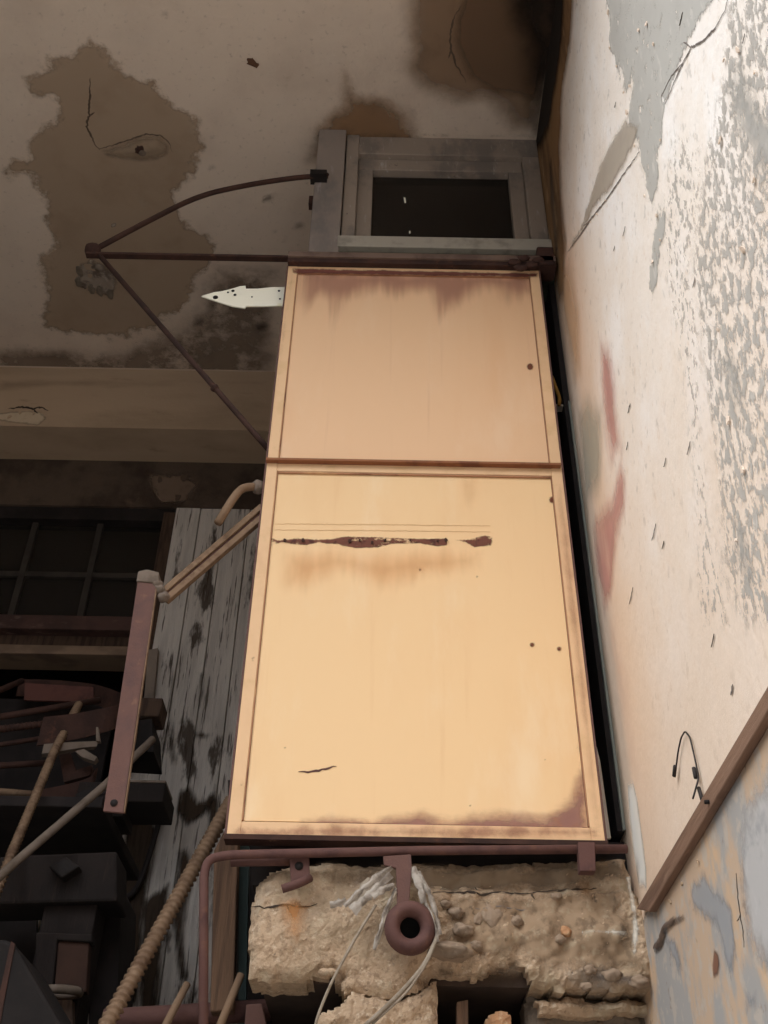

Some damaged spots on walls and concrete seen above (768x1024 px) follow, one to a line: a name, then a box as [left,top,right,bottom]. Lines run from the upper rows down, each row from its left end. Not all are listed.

crack [661,0,728,104]
crack [85,79,172,151]
damp [324,98,411,138]
damp [5,40,215,337]
damp [414,0,575,346]
crack [569,152,639,250]
damp [0,277,268,370]
peeling [606,0,768,621]
crack [432,887,597,911]
peeling [439,729,768,1024]